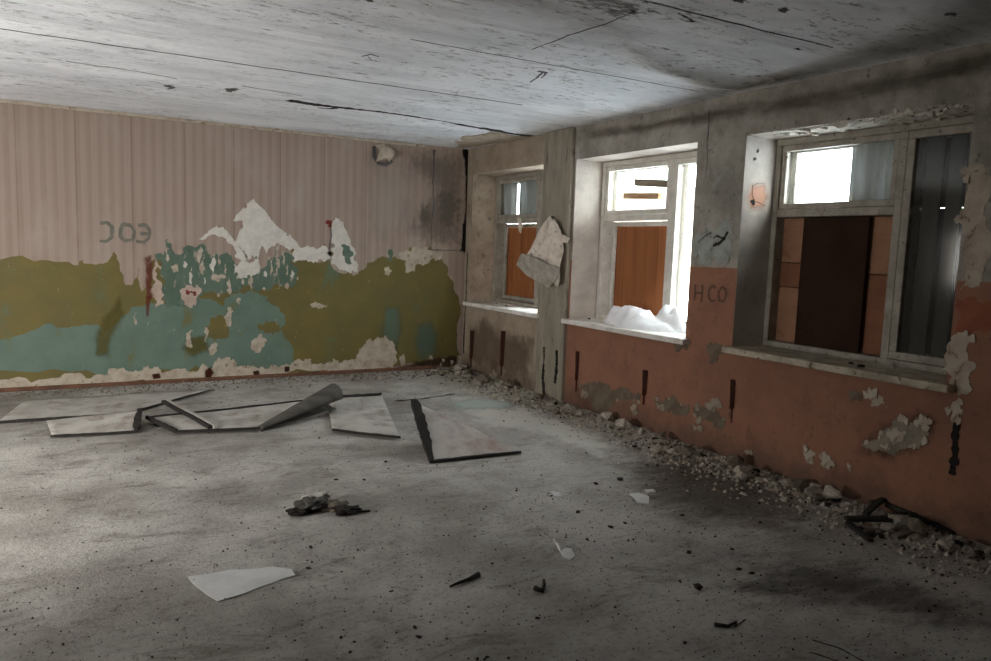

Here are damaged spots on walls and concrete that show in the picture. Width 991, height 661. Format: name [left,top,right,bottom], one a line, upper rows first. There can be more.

crack [410,0,833,178]
peeling [954,163,991,290]
peeling [0,231,462,388]
spalling [579,382,642,416]
peeling [803,444,852,472]
peeling [847,387,885,407]
spalling [862,413,933,456]
peeling [942,329,977,425]